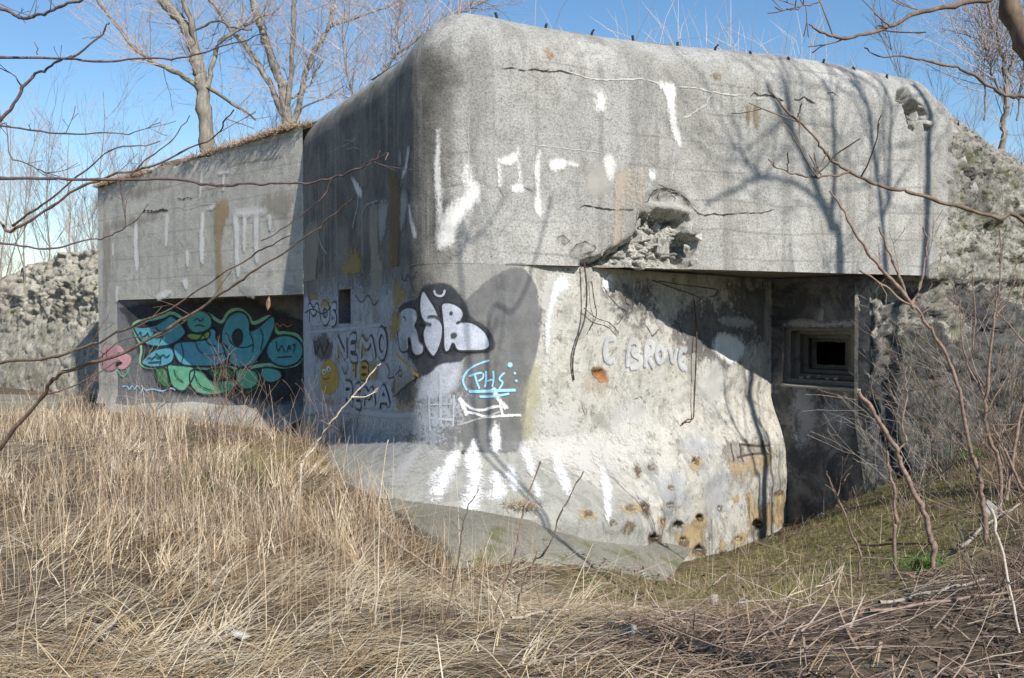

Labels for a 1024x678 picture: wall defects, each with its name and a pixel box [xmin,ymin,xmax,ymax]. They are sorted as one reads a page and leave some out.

crack [466,67,835,162]
spalling [896,86,934,132]
water stain [181,170,229,290]
crack [580,204,634,212]
crack [659,161,774,216]
spalling [557,184,754,424]
rust [592,367,609,383]
spalling [690,456,704,471]
spalling [723,437,774,479]
spalling [579,483,724,558]
spalling [720,519,763,554]